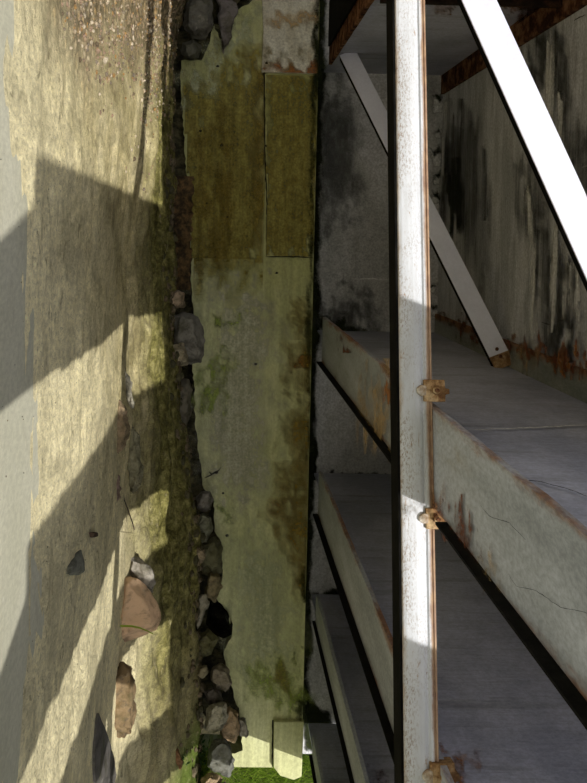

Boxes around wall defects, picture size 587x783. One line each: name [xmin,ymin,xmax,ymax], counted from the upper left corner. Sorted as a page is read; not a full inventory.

corrosion [262,49,317,73]
damp [440,99,488,248]
damp [521,29,587,193]
damp [513,159,584,362]
corrosion [504,330,587,380]